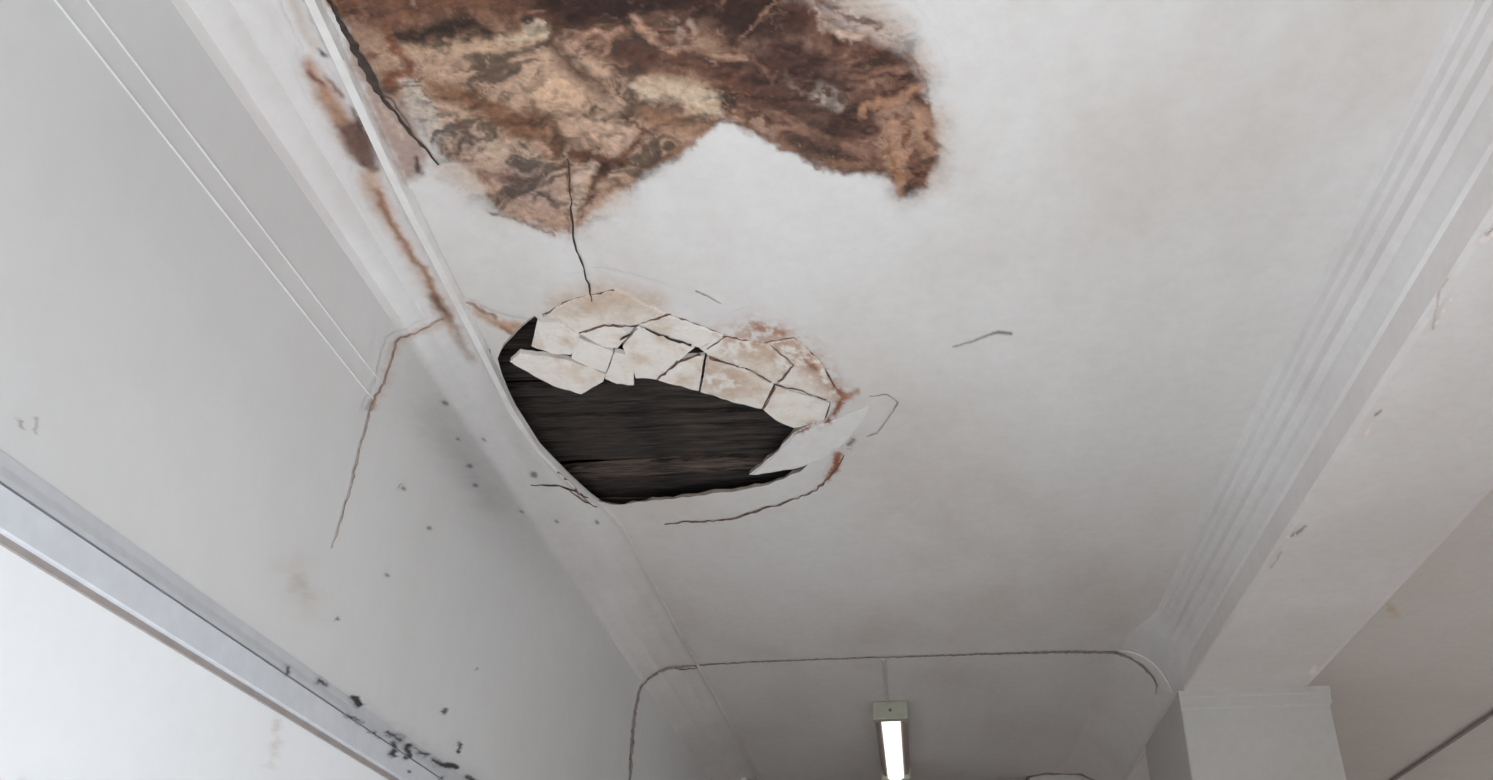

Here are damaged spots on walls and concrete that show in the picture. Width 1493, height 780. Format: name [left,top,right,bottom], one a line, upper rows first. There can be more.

crack [326,0,439,165]
damp [328,0,963,247]
crack [332,315,454,548]
flaking render [489,291,869,475]
crack [543,159,836,409]
crack [665,394,898,525]